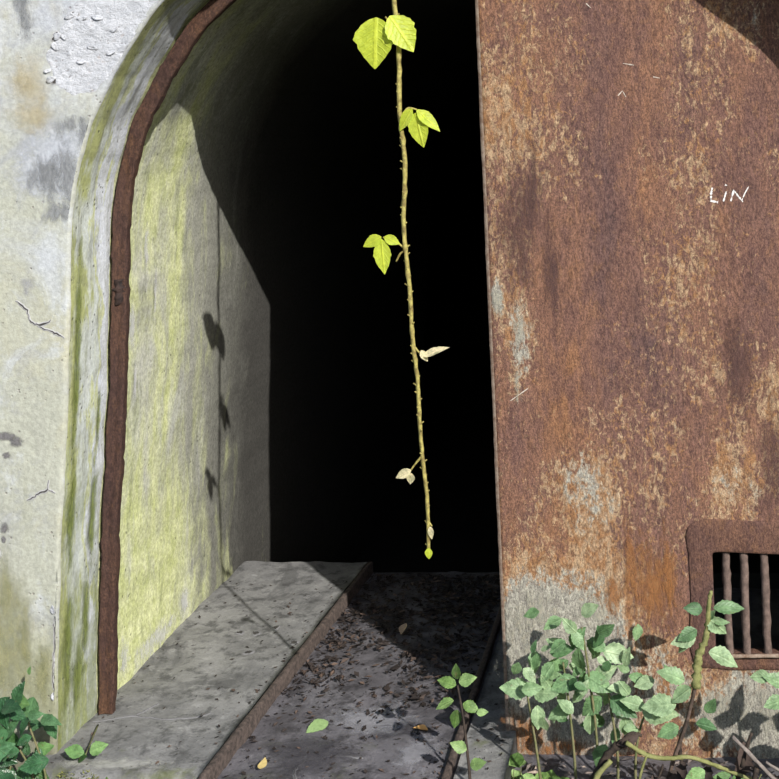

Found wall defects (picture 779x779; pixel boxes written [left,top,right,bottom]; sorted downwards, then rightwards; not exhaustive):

water stain [14,0,29,29]
flaking render [43,0,160,95]
water stain [18,119,88,219]
crack [15,300,65,338]
water stain [0,432,22,459]
water stain [68,477,76,561]
water stain [65,584,89,708]
corrosion [511,707,584,755]